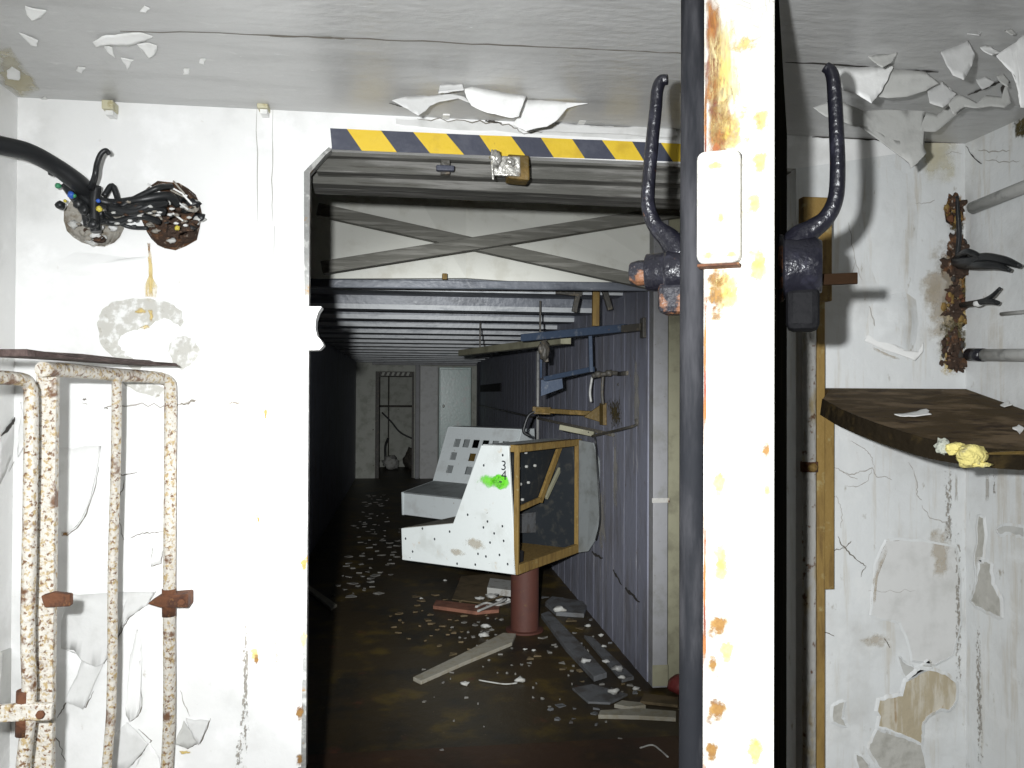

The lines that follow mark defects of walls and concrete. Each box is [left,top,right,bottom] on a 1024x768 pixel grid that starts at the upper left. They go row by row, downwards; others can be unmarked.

peeling [392,84,677,142]
corrosion [704,1,767,169]
peeling [837,29,1024,168]
spalling [95,296,203,401]
corrosion [939,192,970,373]
crack [834,441,951,593]
peeling [61,592,155,709]
peeling [112,722,161,768]
corrosion [703,743,718,768]
corrosion [708,699,726,724]
corrosion [703,531,733,671]
peeling [854,514,1024,768]